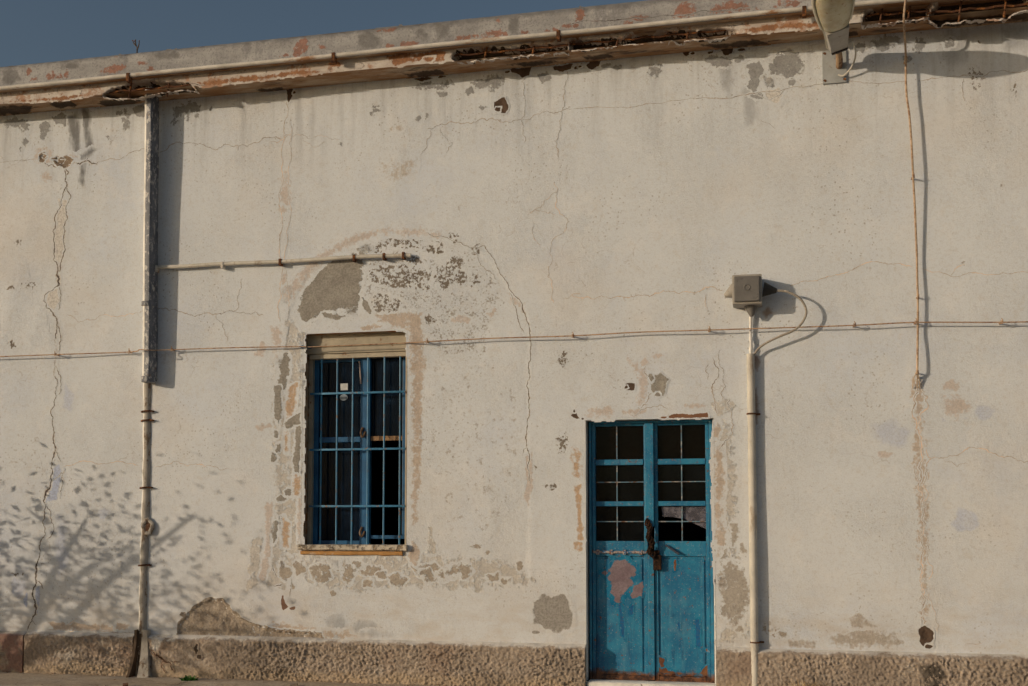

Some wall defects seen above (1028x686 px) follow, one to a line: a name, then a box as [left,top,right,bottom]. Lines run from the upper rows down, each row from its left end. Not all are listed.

water stain [0,96,143,188]
peeling [409,26,812,115]
crack [420,69,1028,158]
crack [529,184,724,310]
crack [0,102,293,631]
peeling [148,221,577,661]
crack [428,233,533,483]
crack [704,350,735,449]
peeling [937,378,975,424]
peeling [551,371,935,652]
peeling [9,570,131,633]
crack [151,649,179,673]